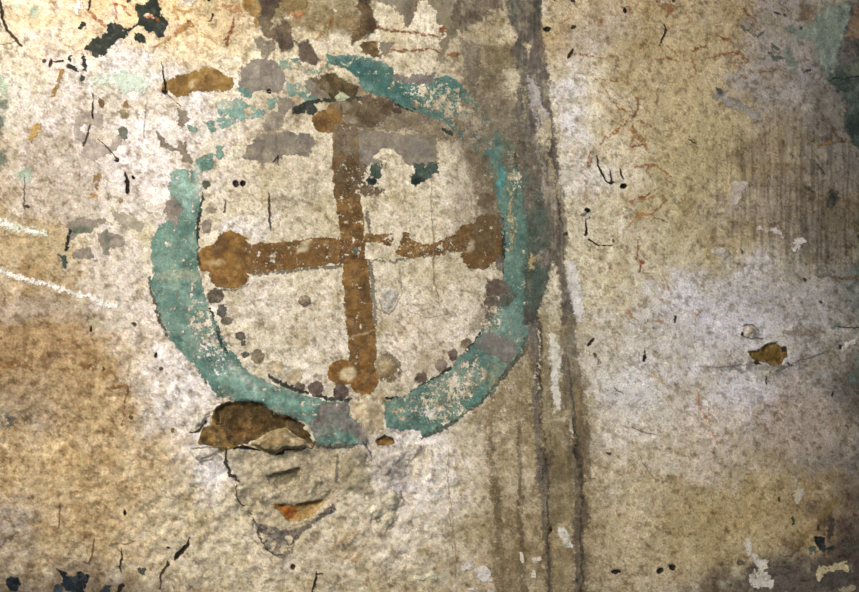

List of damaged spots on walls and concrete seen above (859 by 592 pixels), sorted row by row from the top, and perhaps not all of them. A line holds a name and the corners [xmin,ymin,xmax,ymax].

leakage [254,0,377,65]
leakage [311,0,591,592]